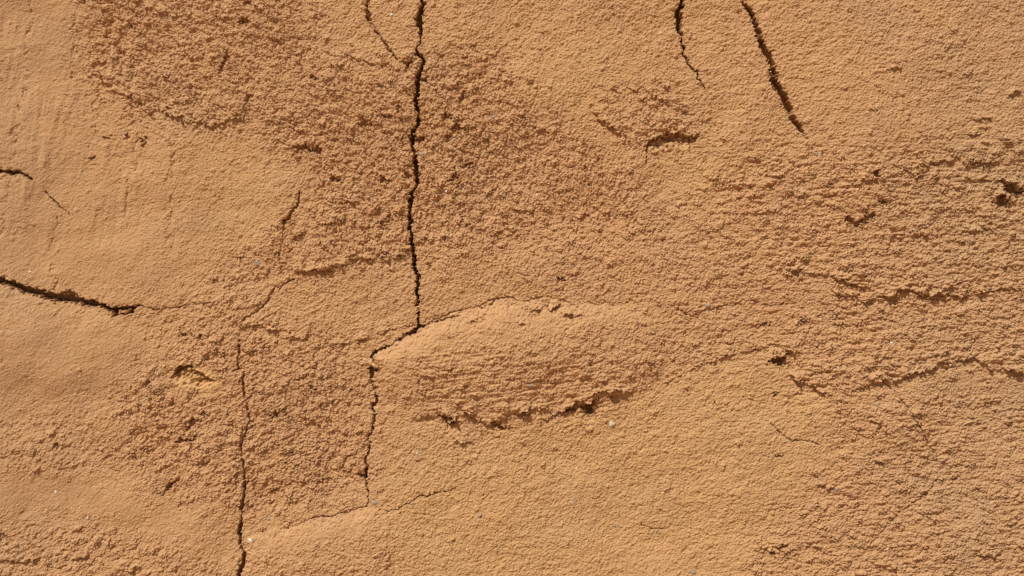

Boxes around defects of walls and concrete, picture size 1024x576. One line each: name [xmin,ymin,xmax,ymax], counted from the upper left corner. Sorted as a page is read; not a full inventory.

crack [734,0,811,140]
crack [0,275,212,318]
crack [231,189,302,576]
crack [291,0,796,529]